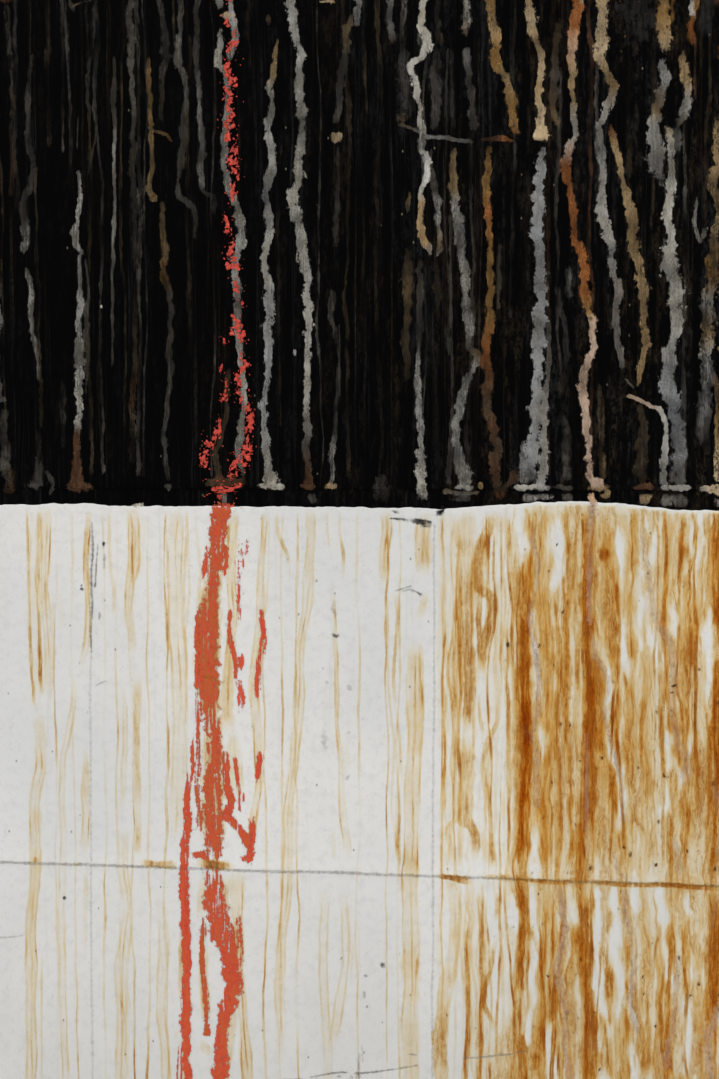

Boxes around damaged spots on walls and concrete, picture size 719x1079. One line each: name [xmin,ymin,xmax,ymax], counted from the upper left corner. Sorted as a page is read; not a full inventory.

leakage [284,0,306,65]
leakage [264,120,276,171]
leakage [646,113,719,269]
leakage [400,0,637,515]
leakage [212,215,280,488]
leakage [633,317,690,502]
rust [581,620,595,713]
rust [611,681,621,764]
rust [686,637,699,737]
rust [580,898,594,965]
rust [533,1012,559,1079]
rust [573,1000,608,1075]